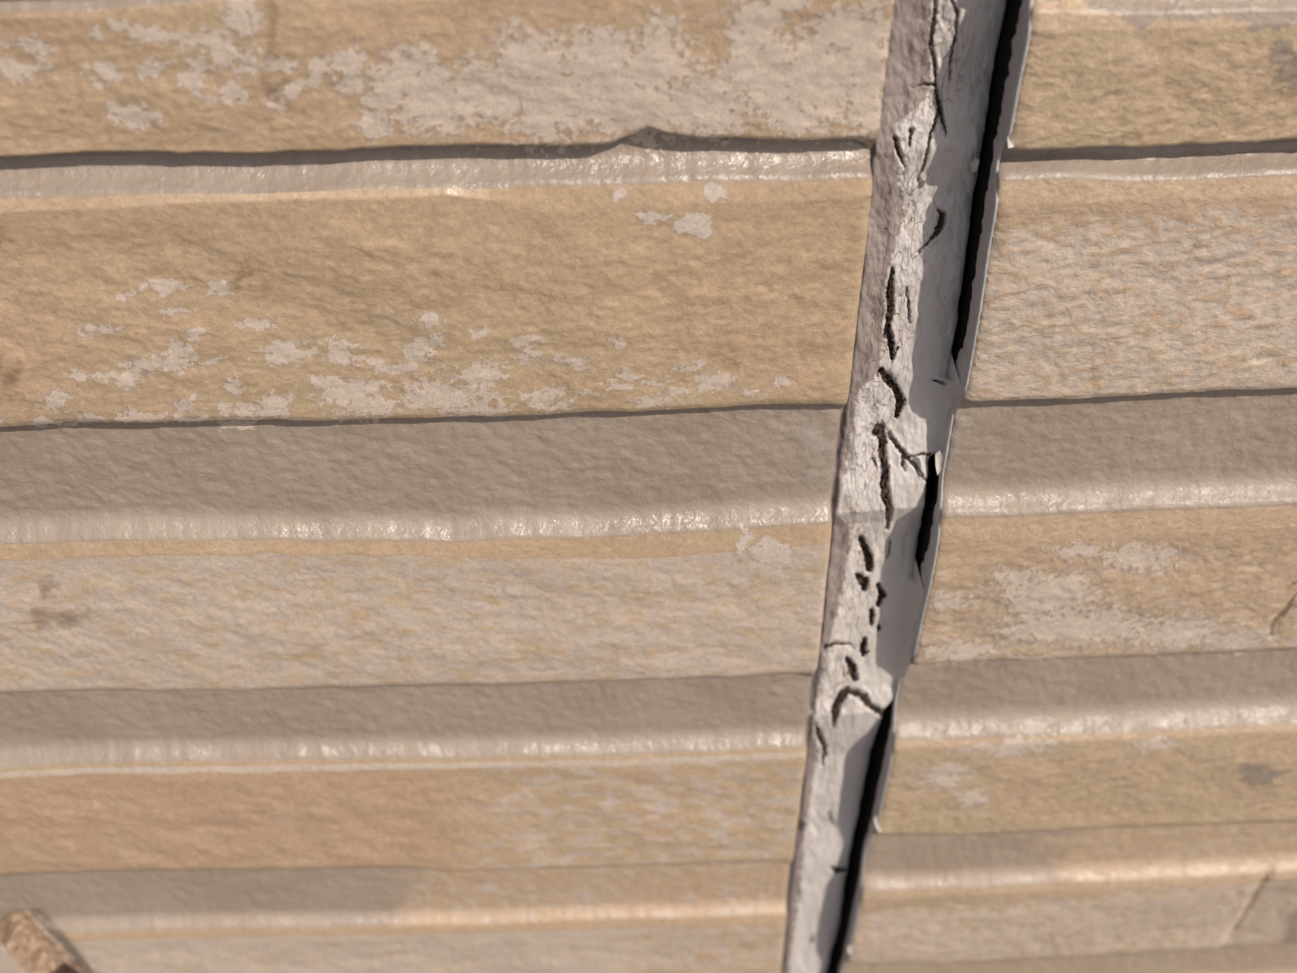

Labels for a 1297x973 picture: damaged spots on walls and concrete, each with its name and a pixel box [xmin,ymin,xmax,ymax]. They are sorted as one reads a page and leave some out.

peeling [0,0,895,174]
crack [894,0,957,181]
crack [884,211,944,337]
peeling [0,276,793,433]
crack [872,423,931,557]
crack [824,640,850,648]
crack [1270,581,1297,635]
crack [816,688,885,766]